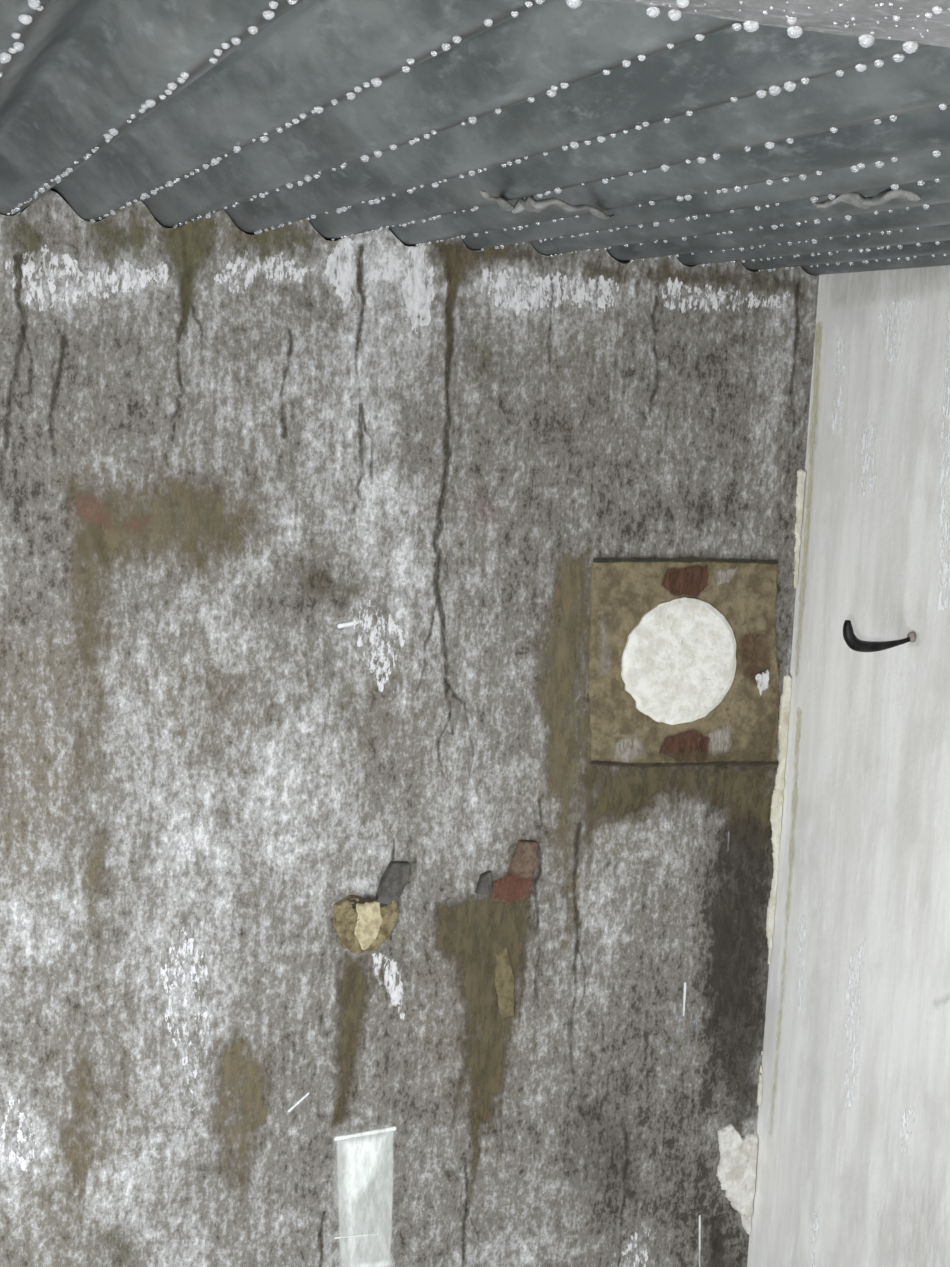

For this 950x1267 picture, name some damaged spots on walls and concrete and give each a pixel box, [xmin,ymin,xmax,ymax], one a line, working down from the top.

crack [0,255,29,489]
crack [49,335,66,451]
crack [173,277,194,416]
crack [280,330,292,433]
crack [356,245,366,351]
crack [354,405,372,510]
crack [424,246,465,734]
spalling [333,894,405,1020]
water stain [332,954,383,1125]
water stain [435,896,530,1194]
crack [460,1158,468,1265]
peeling [740,1214,752,1235]